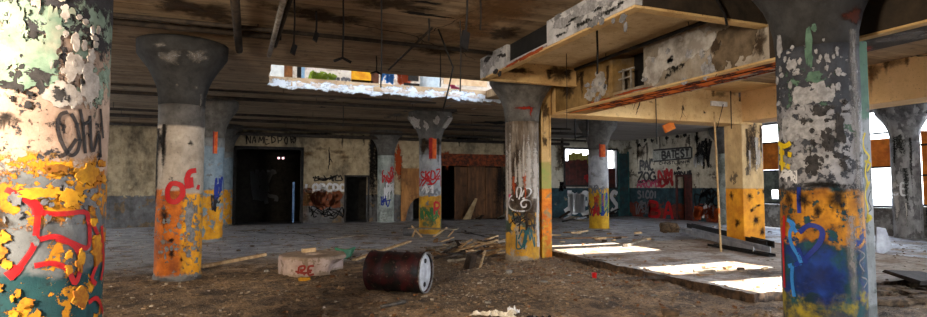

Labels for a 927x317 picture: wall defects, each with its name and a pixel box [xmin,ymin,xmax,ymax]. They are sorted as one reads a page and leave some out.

peeling [0,0,102,109]
spalling [0,112,18,130]
peeling [571,24,850,176]
peeling [0,159,107,275]
peeling [158,200,199,277]
peeling [0,283,44,317]
peeling [71,285,89,309]